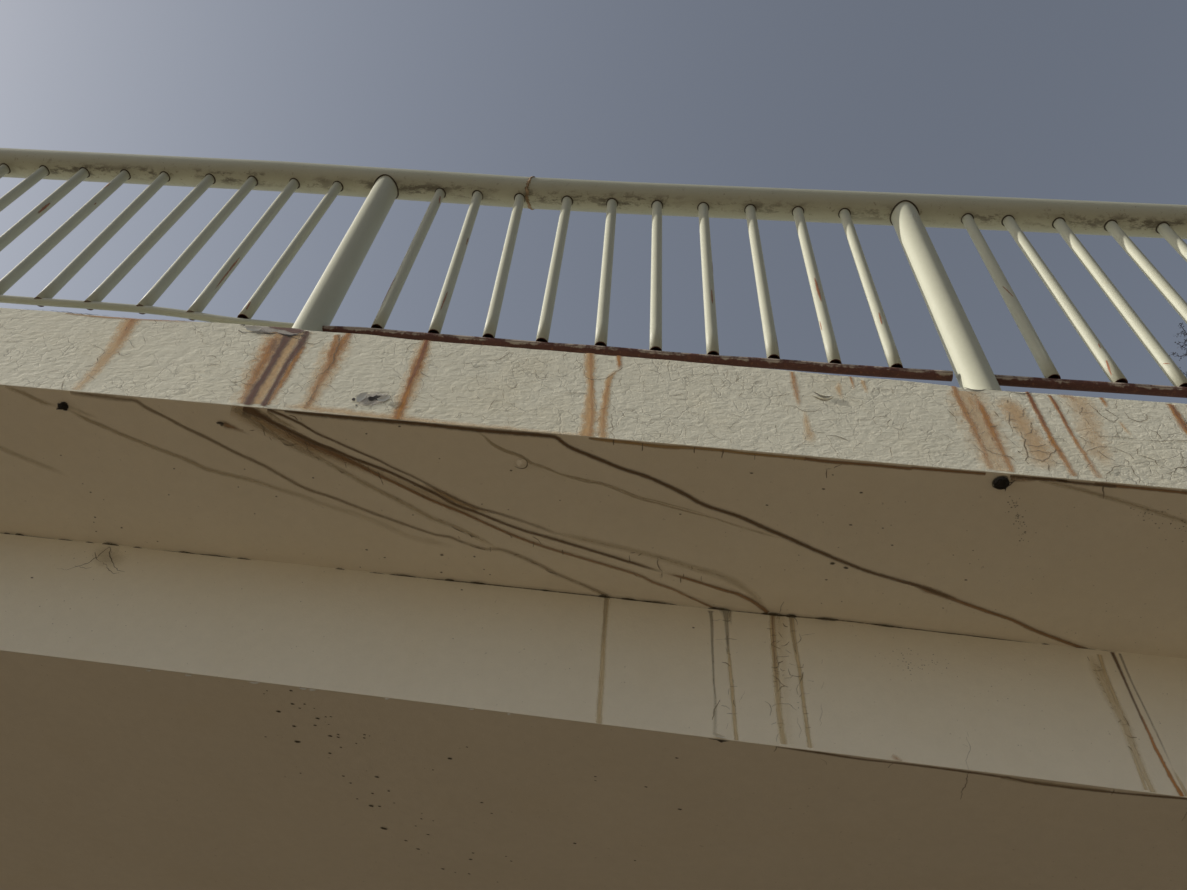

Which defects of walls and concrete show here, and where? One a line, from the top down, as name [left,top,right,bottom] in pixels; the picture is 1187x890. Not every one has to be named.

crack [3,308,262,397]
rust [242,331,309,406]
crack [250,336,383,484]
rust [305,333,351,408]
rust [394,340,429,419]
rust [580,353,621,438]
crack [393,341,914,478]
rust [1002,392,1075,476]
crack [928,387,1187,499]
rust [1048,395,1095,471]
damp [79,393,1187,800]
rust [1111,652,1187,796]